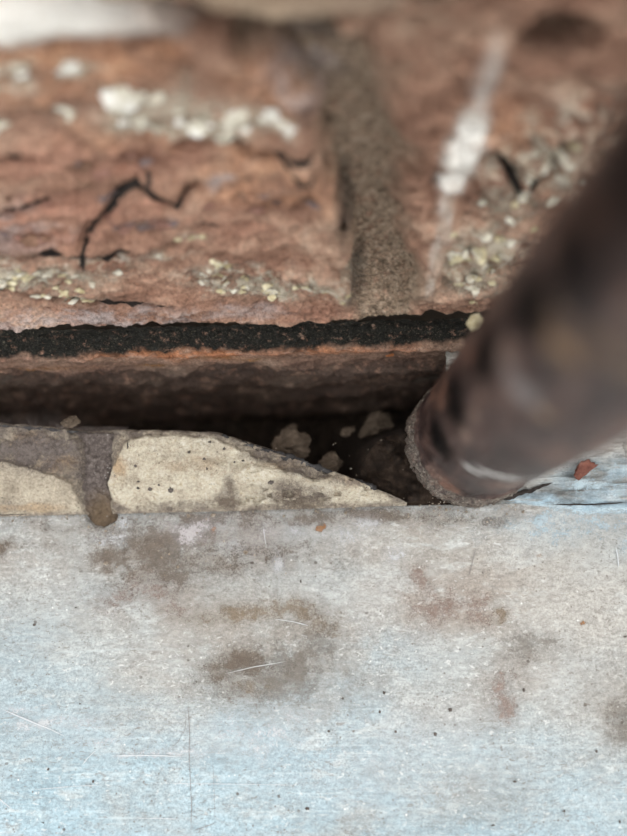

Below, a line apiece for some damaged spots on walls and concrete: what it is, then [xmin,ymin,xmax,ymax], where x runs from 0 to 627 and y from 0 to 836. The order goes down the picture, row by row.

spalling [0,423,129,527]
efflorescence [165,520,213,546]
water stain [203,650,272,683]